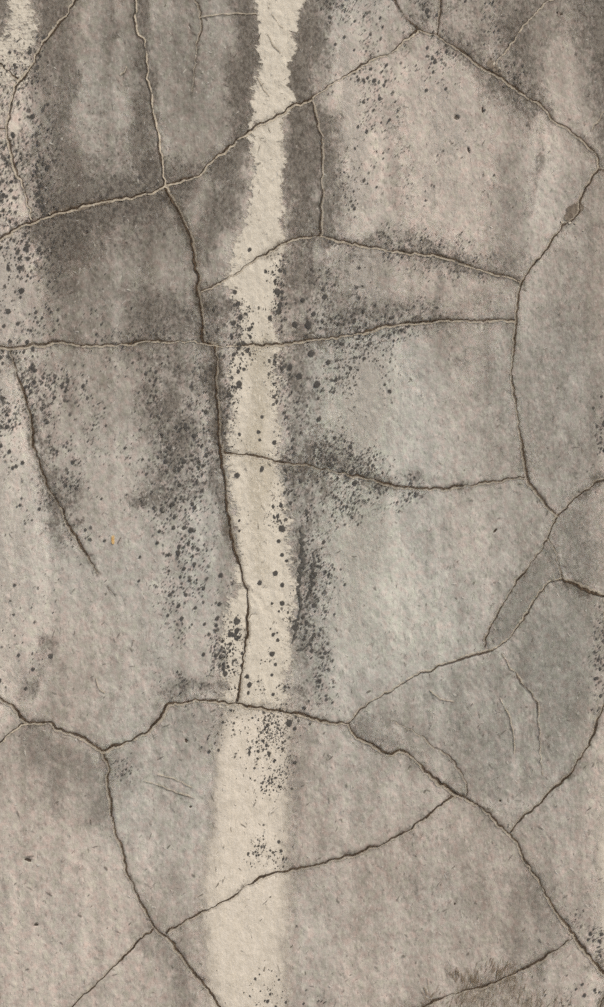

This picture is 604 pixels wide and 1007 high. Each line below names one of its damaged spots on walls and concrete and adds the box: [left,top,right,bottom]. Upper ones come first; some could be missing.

water stain [389,0,544,119]
water stain [575,0,604,105]
water stain [344,220,497,286]
crack [0,0,604,702]
water stain [0,0,446,1007]
crack [501,653,540,742]
crack [0,697,604,1007]